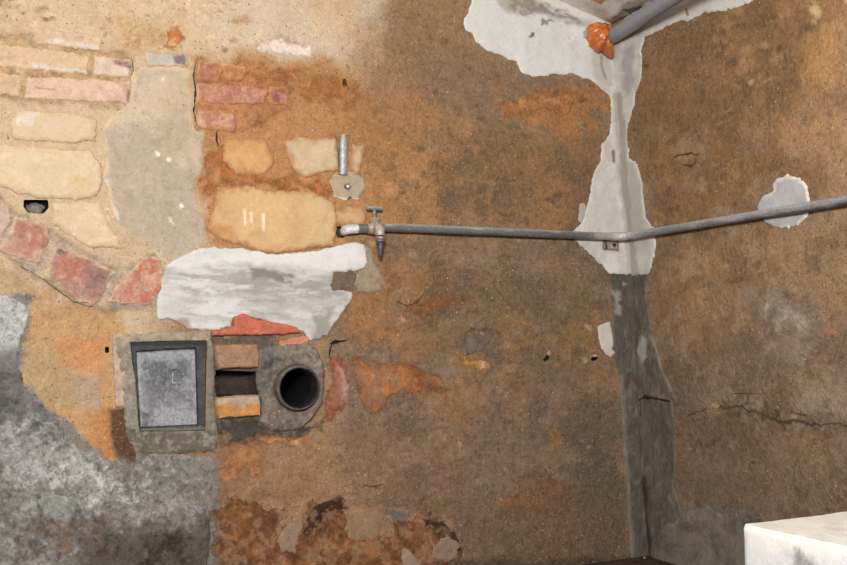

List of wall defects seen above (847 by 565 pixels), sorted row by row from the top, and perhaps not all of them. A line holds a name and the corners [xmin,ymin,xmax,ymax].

peeling [0,27,368,346]
peeling [463,0,754,565]
corrosion [325,357,450,421]
crack [639,395,671,416]
crack [687,393,847,427]
damp [0,427,157,516]